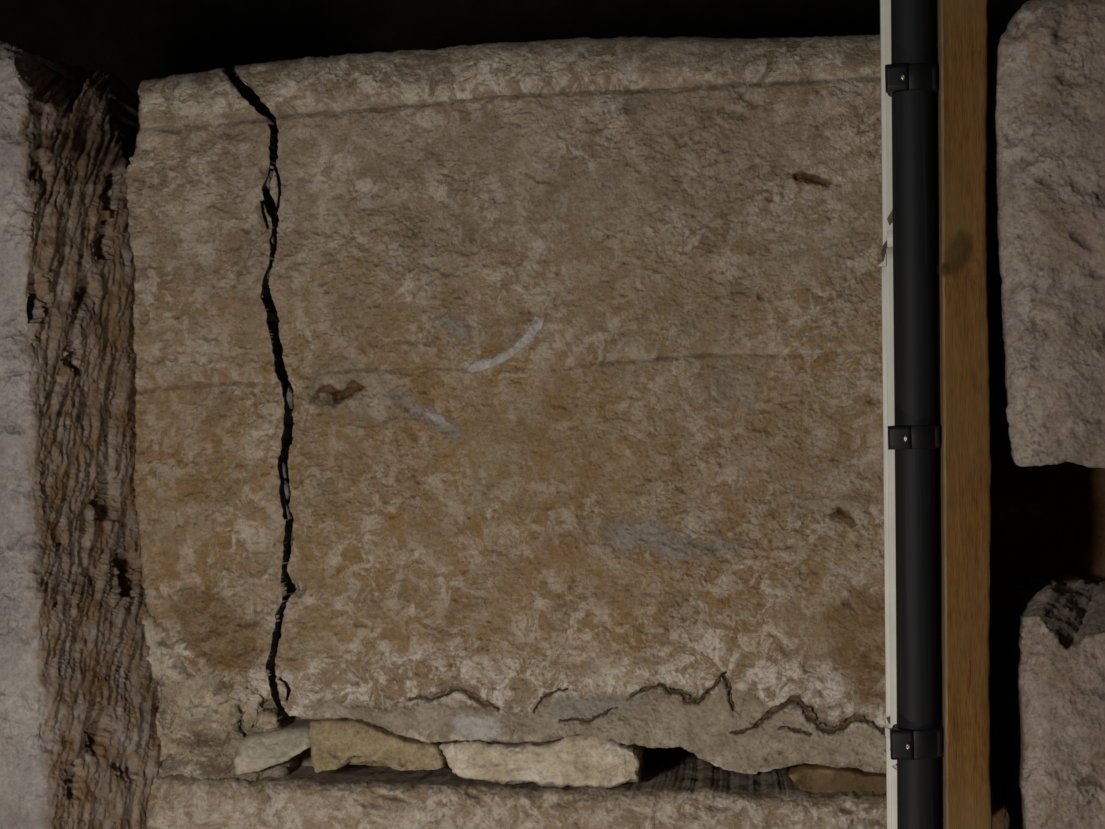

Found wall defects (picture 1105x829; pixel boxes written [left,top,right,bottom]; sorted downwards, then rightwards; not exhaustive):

crack [224,64,300,718]
crack [408,689,499,711]
spalling [313,683,897,773]
crack [533,671,886,737]